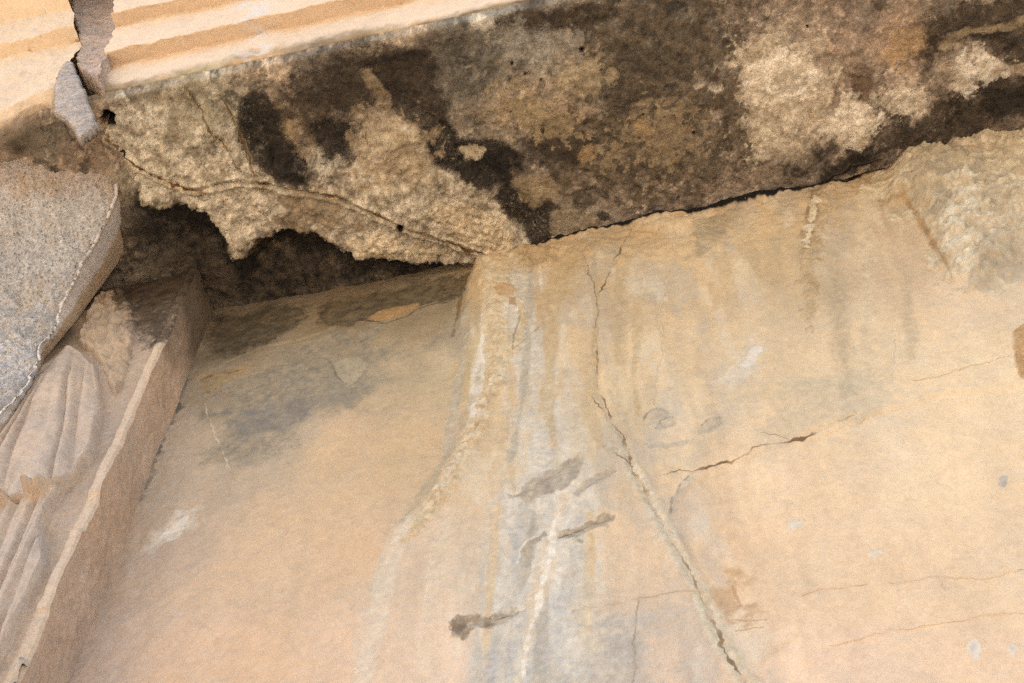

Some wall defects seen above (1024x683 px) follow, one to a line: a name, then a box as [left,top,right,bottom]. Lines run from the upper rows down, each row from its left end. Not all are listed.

crack [110,87,483,255]
leakage [229,0,784,264]
crack [542,152,887,683]
leakage [698,0,1024,468]